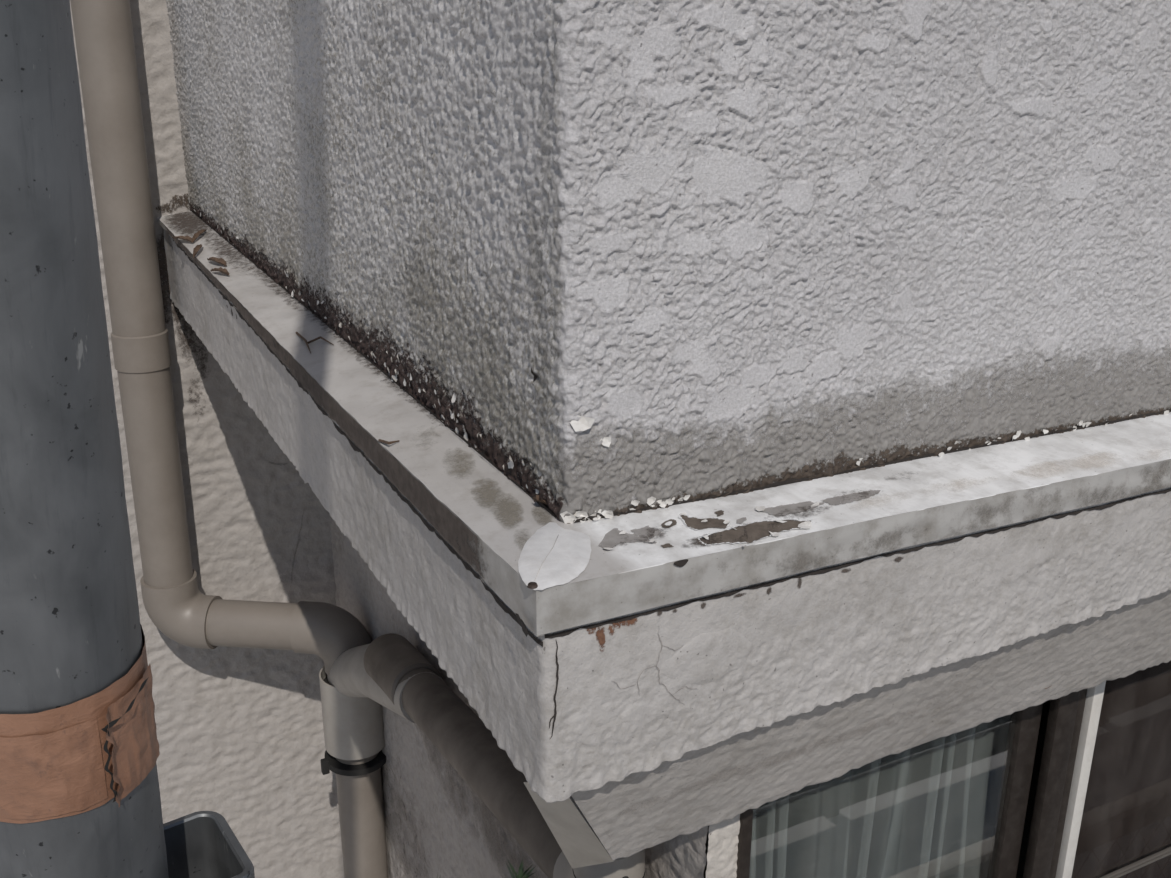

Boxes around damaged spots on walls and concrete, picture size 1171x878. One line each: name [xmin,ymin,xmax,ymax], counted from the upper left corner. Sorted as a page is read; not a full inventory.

damp [156,194,1171,578]
peeling [570,416,595,432]
peeling [560,490,880,550]
rust [587,618,637,651]
crack [549,641,559,739]